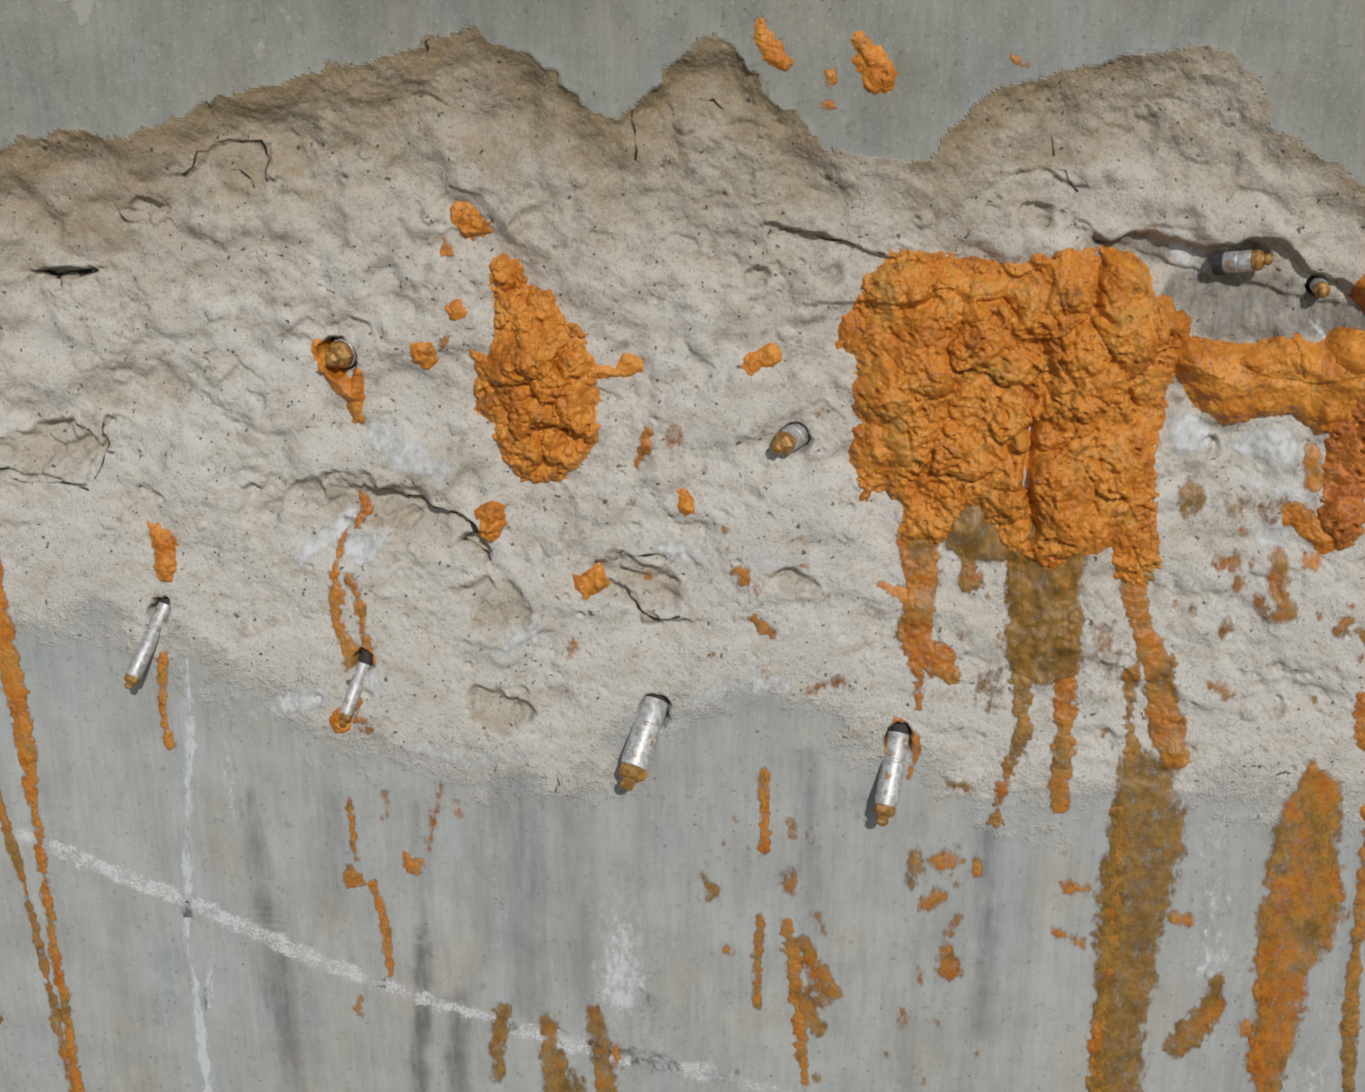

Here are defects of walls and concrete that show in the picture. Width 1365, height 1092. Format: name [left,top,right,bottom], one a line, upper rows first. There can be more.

crack [183,139,269,188]
spalling [0,23,1365,813]
corrosion [328,490,376,672]
crack [627,588,680,621]
corrosion [1212,547,1321,624]
corrosion [0,561,84,1092]
corrosion [757,767,773,855]
corrosion [539,1005,622,1092]
corrosion [750,912,842,1086]
corrosion [1052,745,1193,1092]
corrosion [1163,972,1226,1058]
corrosion [1241,760,1365,1092]